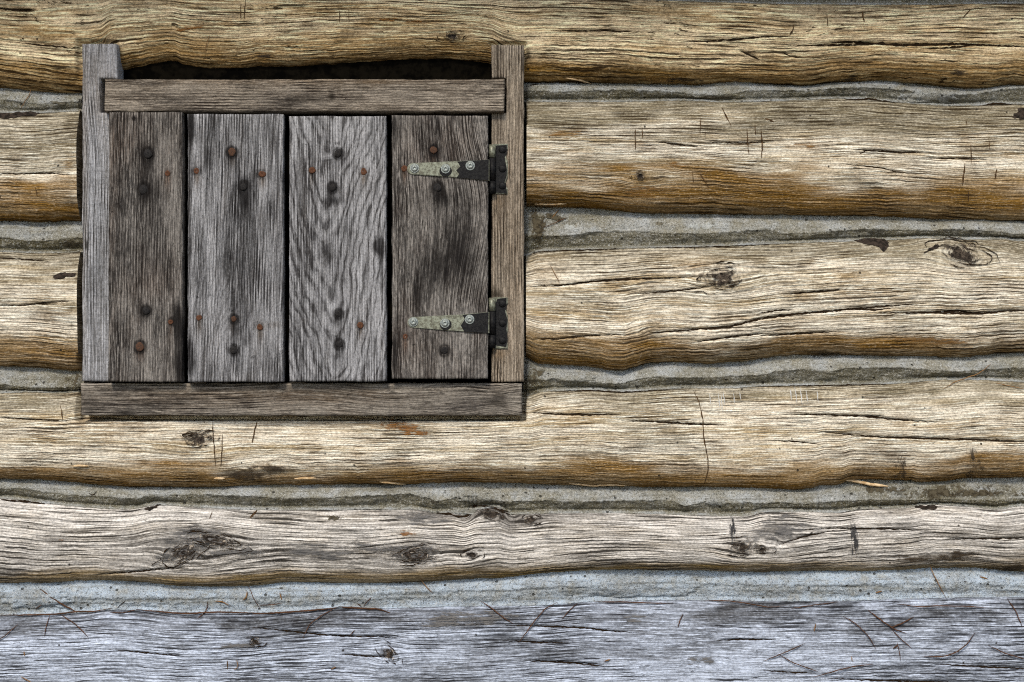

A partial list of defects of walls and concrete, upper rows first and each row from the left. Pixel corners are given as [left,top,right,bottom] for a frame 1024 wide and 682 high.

crack [658,289,1024,343]
corrosion [386,417,428,436]